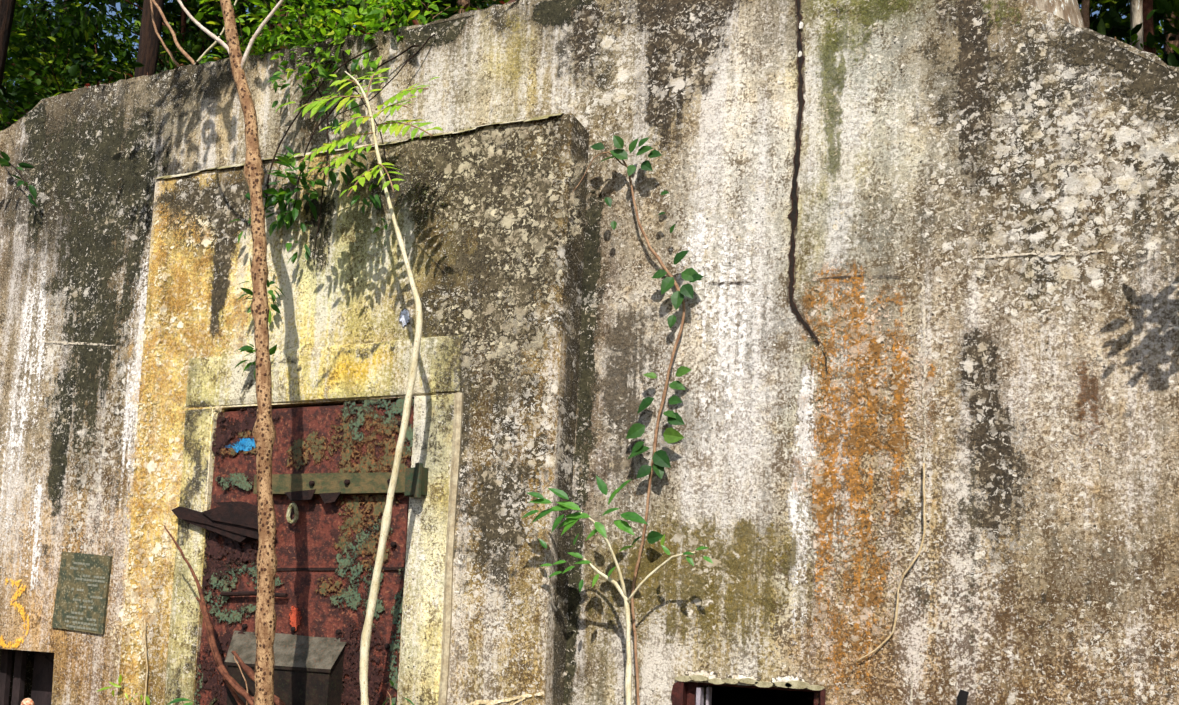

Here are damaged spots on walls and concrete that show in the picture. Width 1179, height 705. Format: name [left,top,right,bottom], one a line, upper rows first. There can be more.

damp [0,101,277,590]
damp [371,116,658,705]
damp [532,0,751,161]
crack [786,0,828,375]
rust [795,262,936,705]